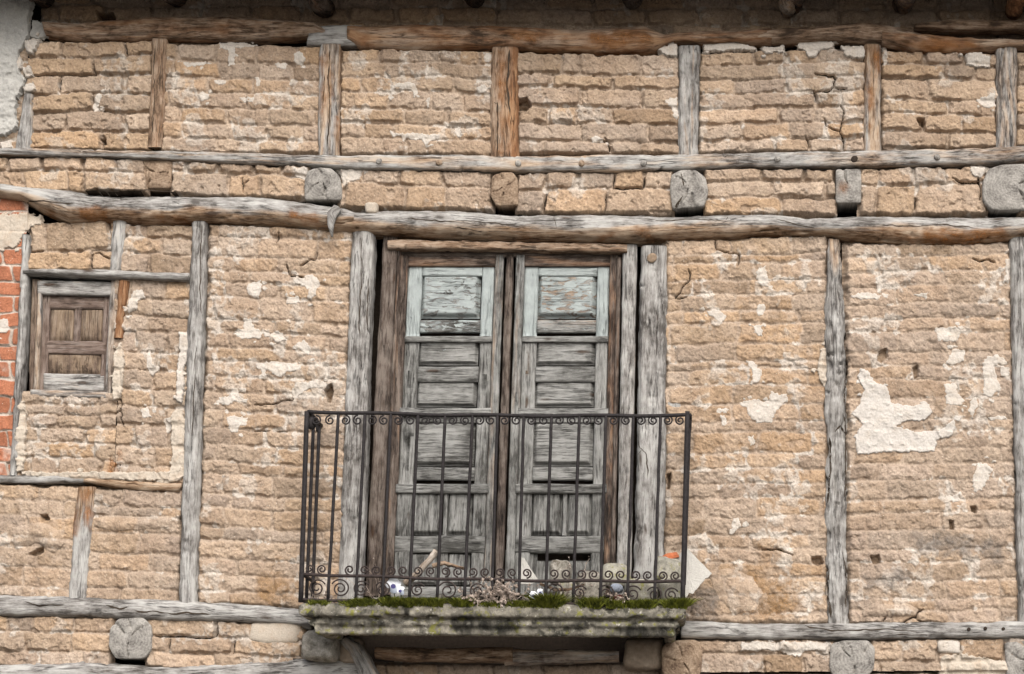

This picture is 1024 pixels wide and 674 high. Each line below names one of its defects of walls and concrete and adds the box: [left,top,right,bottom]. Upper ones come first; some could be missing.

spalling [17,20,49,93]
crack [805,75,845,148]
peeling [0,212,44,252]
spalling [0,318,10,339]
peeling [716,361,788,446]
peeling [851,322,1010,455]